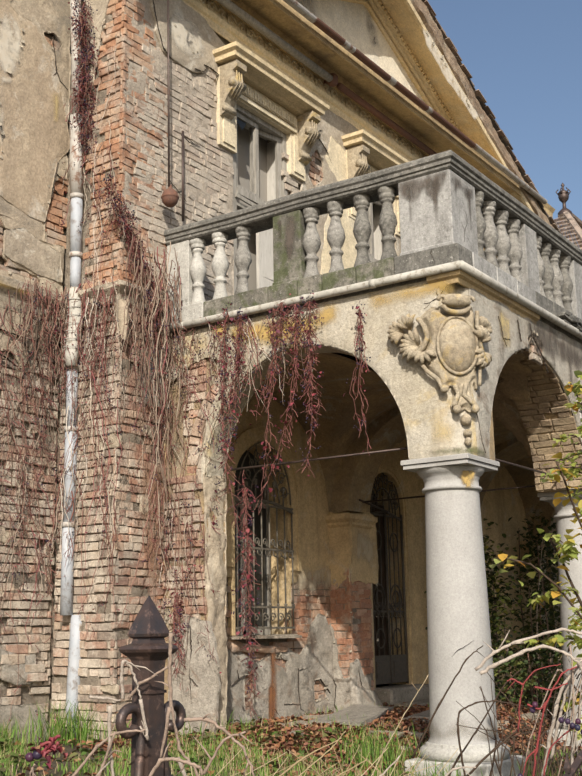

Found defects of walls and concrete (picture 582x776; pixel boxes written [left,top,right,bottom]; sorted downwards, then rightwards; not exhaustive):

peeling [170,16,202,55]
crack [52,37,68,90]
spalling [82,0,171,291]
spalling [45,176,69,251]
spalling [0,217,39,282]
spalling [528,331,542,365]
crack [276,668,337,715]